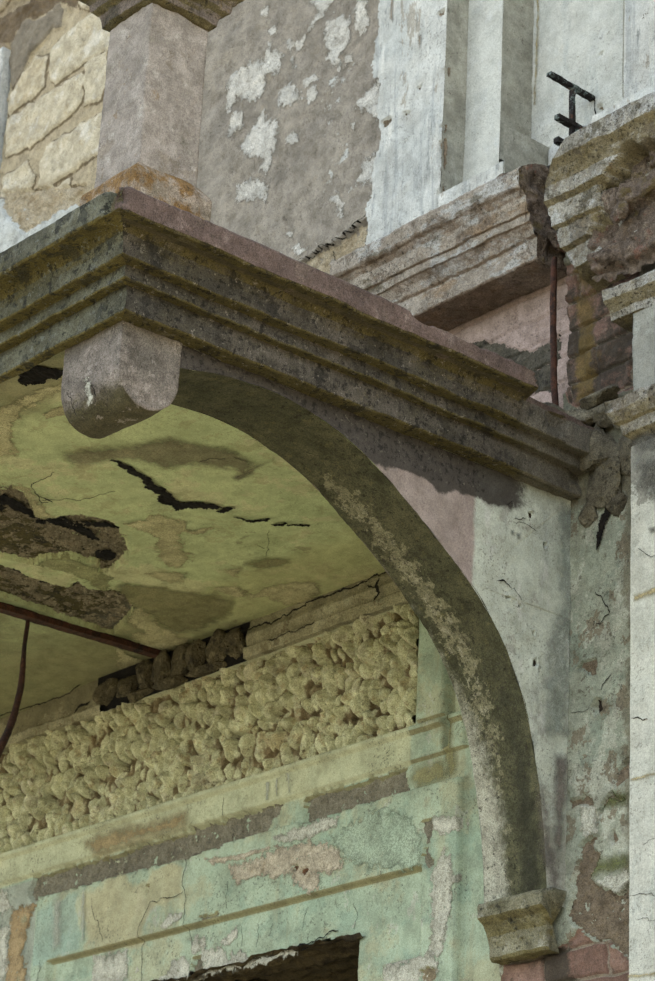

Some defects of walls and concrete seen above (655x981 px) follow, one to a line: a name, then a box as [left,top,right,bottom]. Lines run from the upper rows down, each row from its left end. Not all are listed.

peeling [225,0,371,204]
peeling [350,79,392,130]
flaking render [3,185,87,233]
flaking render [281,224,368,274]
peeling [356,151,376,187]
leakage [473,330,562,394]
peeling [0,366,65,457]
spalling [542,384,637,528]
crack [31,459,310,554]
spalling [0,482,246,706]
flaking render [0,771,469,981]
flaking render [569,763,630,957]